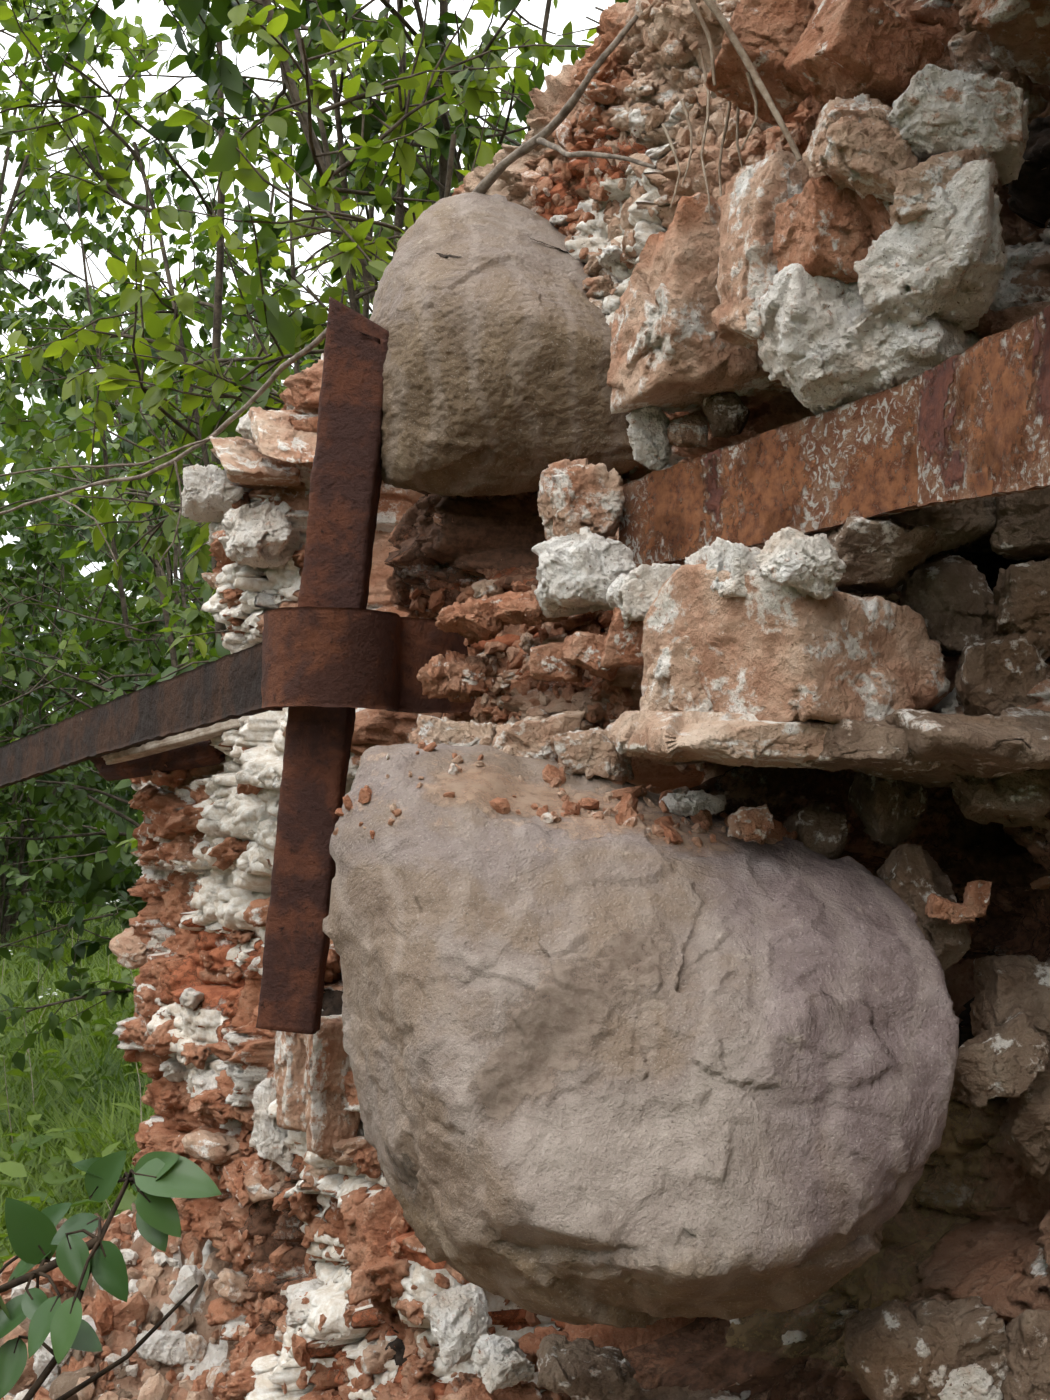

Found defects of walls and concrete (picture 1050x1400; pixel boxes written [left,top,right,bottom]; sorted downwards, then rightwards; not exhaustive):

corrosion [627,306,1050,563]